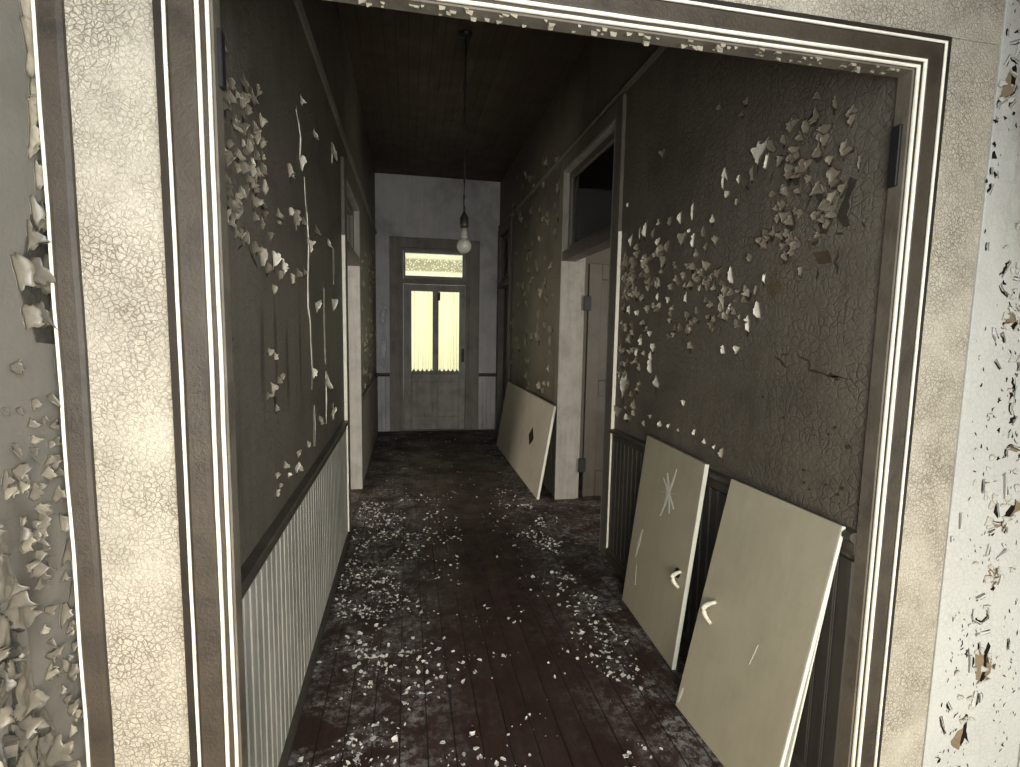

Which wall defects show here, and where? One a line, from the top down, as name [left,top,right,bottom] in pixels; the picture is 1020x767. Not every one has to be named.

peeling [9,0,59,378]
peeling [223,74,338,430]
peeling [614,203,766,433]
peeling [721,91,861,280]
peeling [985,260,1020,354]
peeling [993,54,1019,130]
peeling [0,392,83,767]
peeling [275,440,311,499]
flaking render [935,421,1020,767]